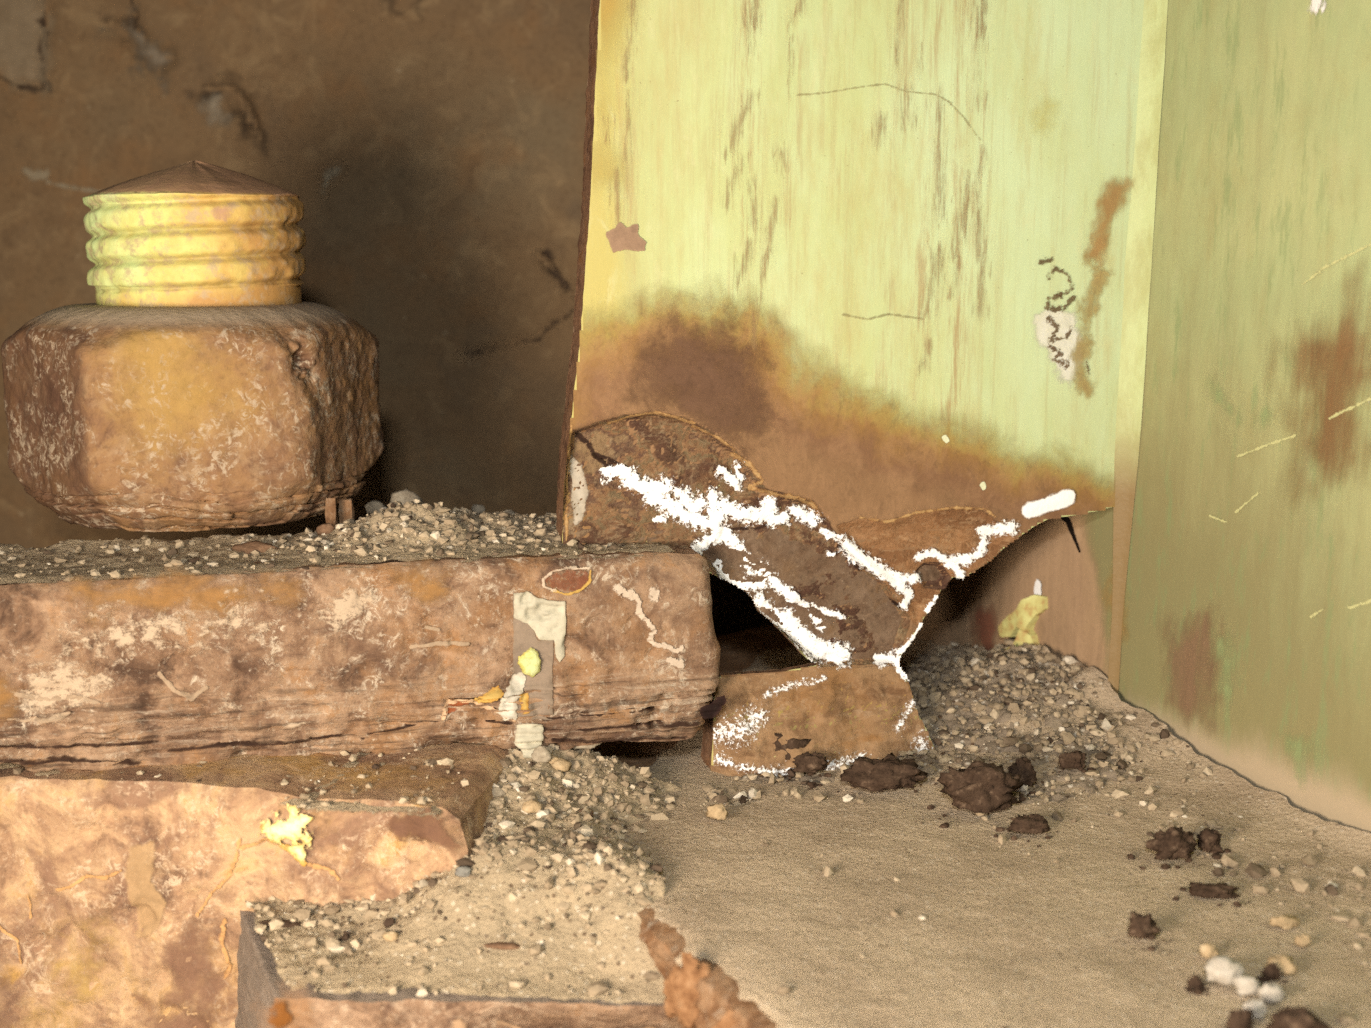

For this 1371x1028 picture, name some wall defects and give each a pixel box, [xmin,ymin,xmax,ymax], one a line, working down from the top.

rust [1071,180,1129,397]
rust [1299,320,1362,470]
rust [542,566,591,595]
spalling [562,412,910,668]
rust [563,294,1115,728]
hole [915,562,951,589]
peeling [998,595,1048,650]